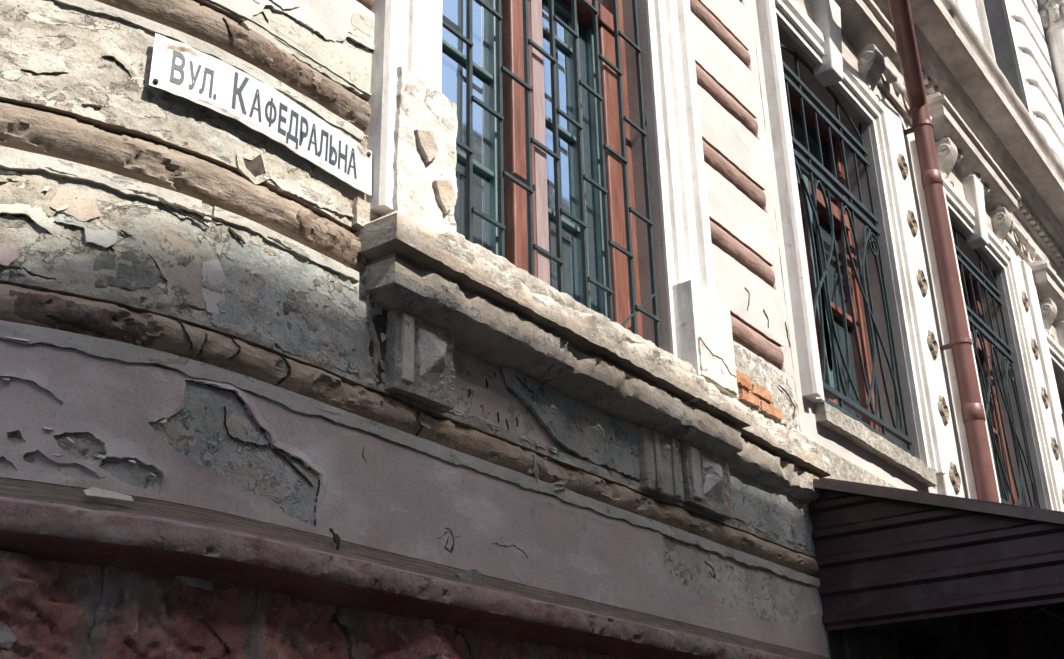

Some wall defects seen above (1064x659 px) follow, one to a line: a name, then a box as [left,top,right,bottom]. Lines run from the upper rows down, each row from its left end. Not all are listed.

spalling [0,203,70,280]
spalling [83,226,167,291]
spalling [236,149,272,185]
spalling [414,129,439,163]
spalling [433,179,456,214]
spalling [9,290,164,347]
flaking render [210,235,388,385]
peeling [0,377,162,494]
peeling [155,381,316,525]
crack [174,318,328,530]
peeling [500,364,641,480]
spalling [698,337,799,433]